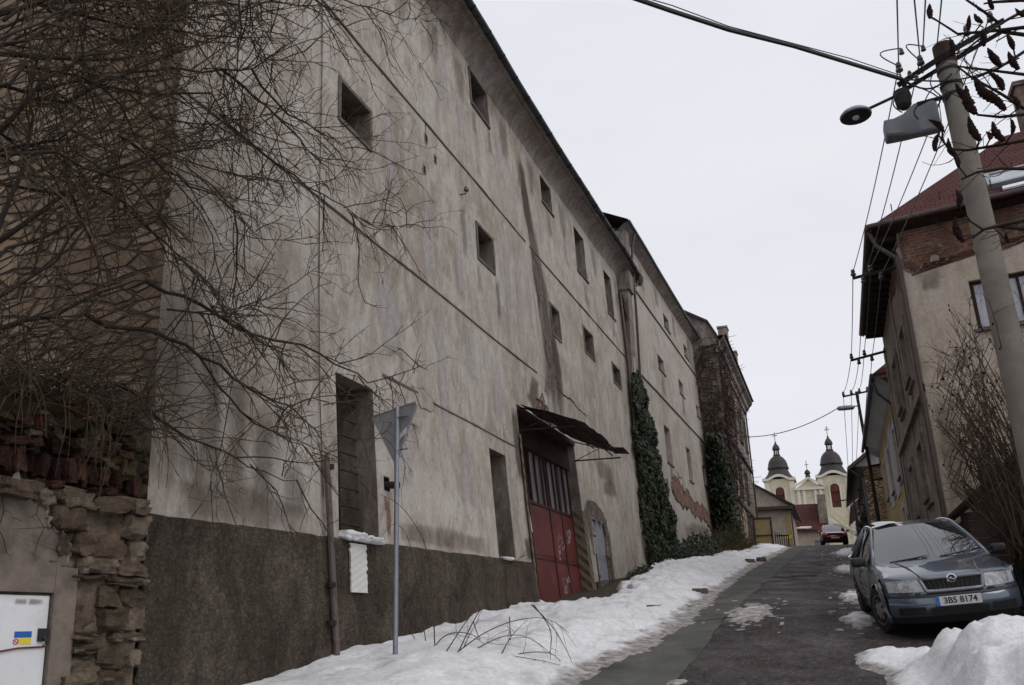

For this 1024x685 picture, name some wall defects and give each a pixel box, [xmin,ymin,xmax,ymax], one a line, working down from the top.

damp [520,165,562,408]
flaking render [889,217,975,303]
flaking render [993,203,1024,251]
flaking render [665,474,711,530]